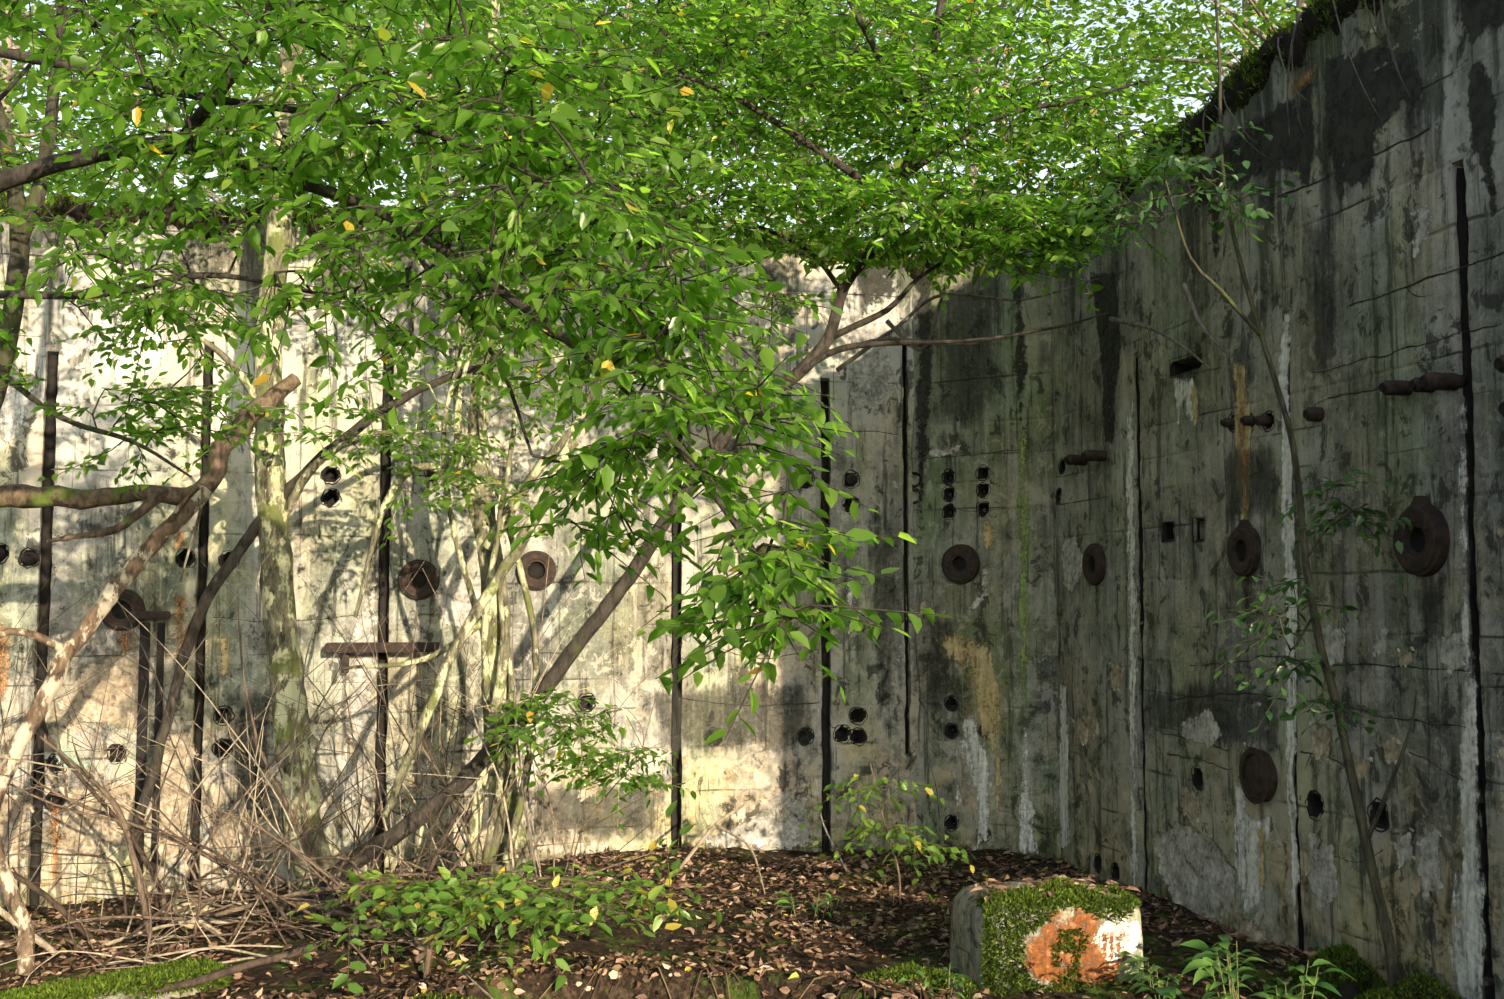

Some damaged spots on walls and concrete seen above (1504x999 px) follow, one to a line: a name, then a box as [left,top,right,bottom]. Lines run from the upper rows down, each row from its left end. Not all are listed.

damp [1455,0,1504,217]
damp [1190,45,1422,376]
rust [1233,364,1252,520]
rust [0,625,9,697]
rust [936,633,1004,816]
efflorescence [956,714,993,850]
damp [1090,272,1140,887]
spalling [1153,783,1236,922]
damp [1156,313,1300,923]